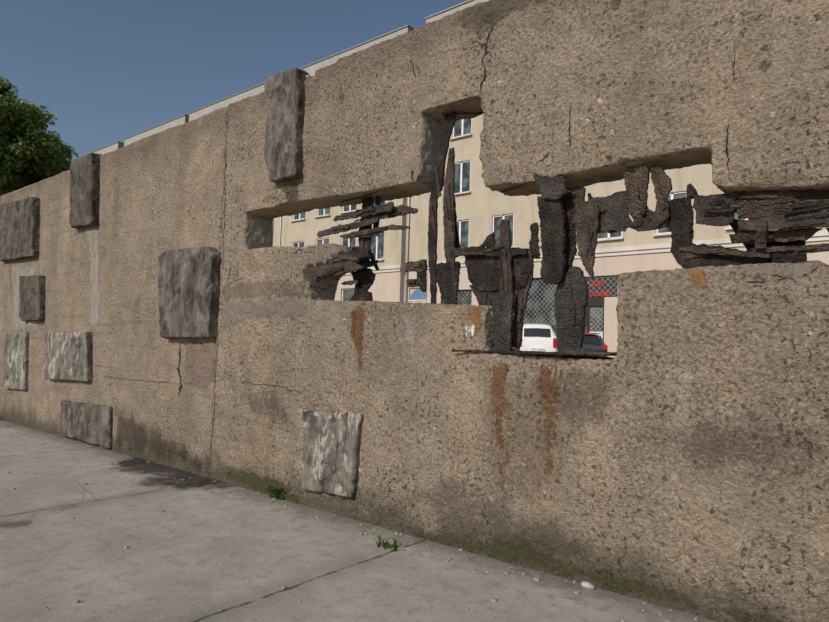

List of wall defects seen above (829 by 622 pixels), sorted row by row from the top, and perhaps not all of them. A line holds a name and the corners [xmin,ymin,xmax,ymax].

crack [472,25,494,90]
rust [350,306,365,371]
damp [115,409,207,469]
crack [104,339,222,447]
rust [489,363,511,489]
rust [536,365,558,474]